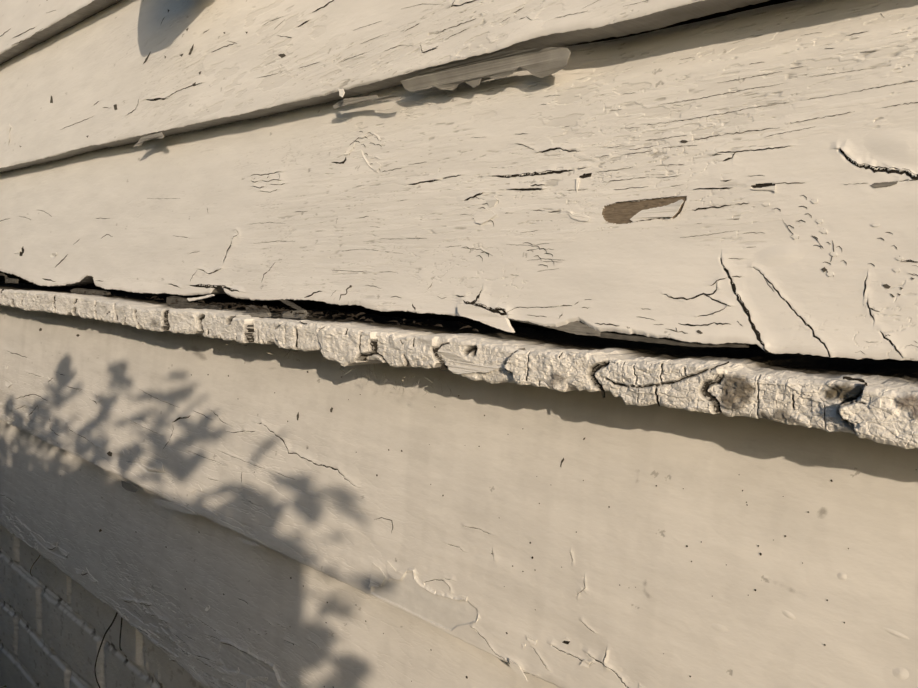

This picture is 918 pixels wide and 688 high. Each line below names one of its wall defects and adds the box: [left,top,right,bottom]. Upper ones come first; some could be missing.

crack [264,0,334,38]
crack [341,0,476,62]
crack [60,83,200,130]
crack [382,162,459,201]
peeling [602,196,687,224]
crack [430,31,918,357]
crack [170,211,307,292]
crack [231,315,477,370]
peeling [437,349,500,374]
crack [591,361,729,413]
crack [134,393,347,502]
peeling [369,561,481,631]